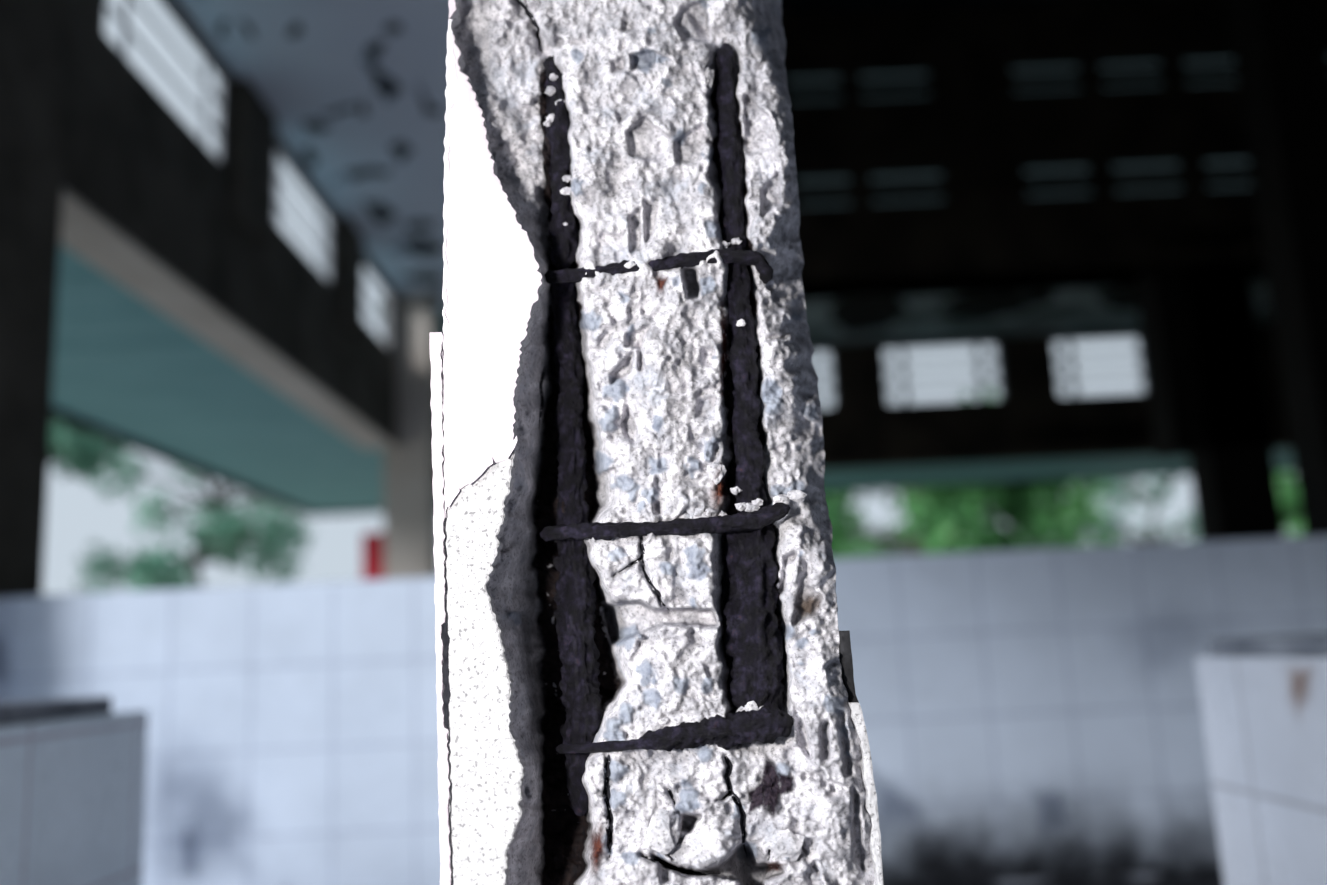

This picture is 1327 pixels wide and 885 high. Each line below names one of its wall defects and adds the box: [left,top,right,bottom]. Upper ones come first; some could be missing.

peeling [362,22,403,103]
crack [515,0,541,51]
peeling [362,201,396,225]
peeling [830,293,909,333]
spalling [388,0,876,885]
crack [619,536,669,610]
crack [603,755,719,875]
crack [721,756,804,860]